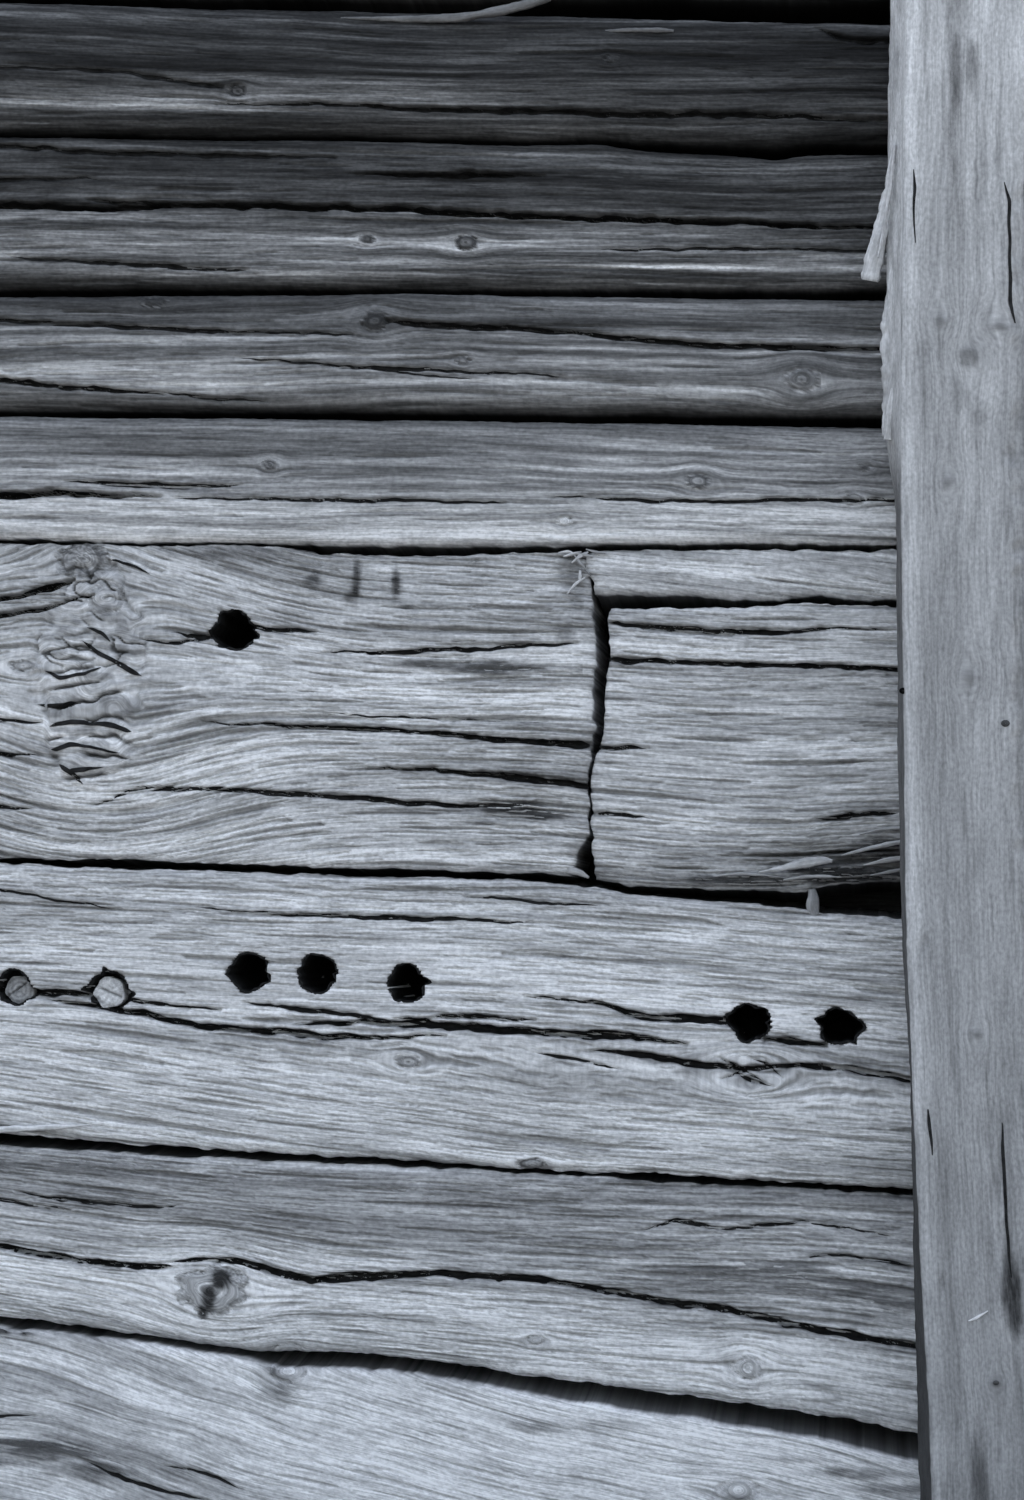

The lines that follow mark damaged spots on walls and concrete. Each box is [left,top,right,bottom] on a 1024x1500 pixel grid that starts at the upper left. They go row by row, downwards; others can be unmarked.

crack [1004,182,1016,323]
crack [112,559,149,574]
crack [607,621,898,672]
crack [0,582,649,818]
crack [816,811,897,820]
crack [1,989,933,1155]
crack [0,1191,176,1210]
crack [646,1218,907,1266]
crack [1001,1123,1012,1272]
crack [0,1243,916,1348]